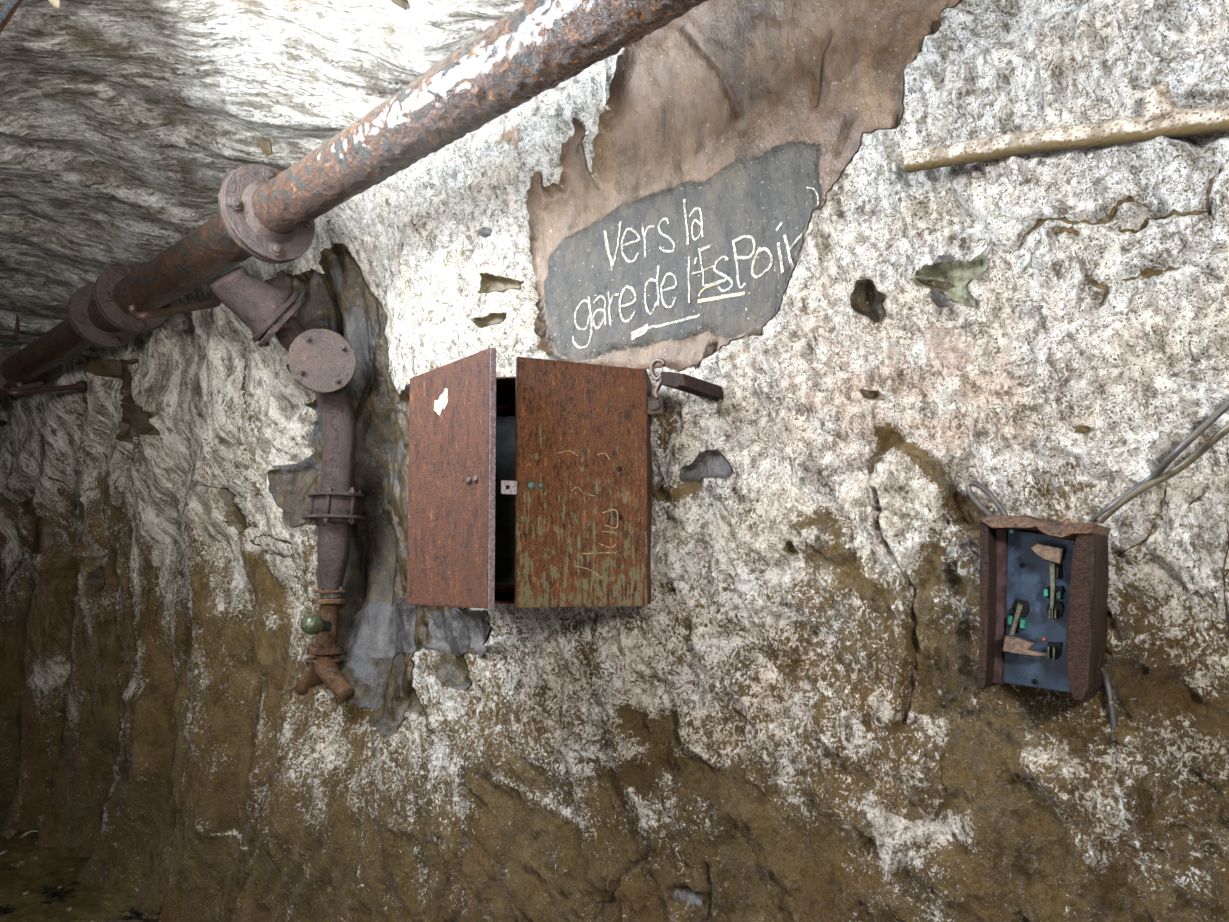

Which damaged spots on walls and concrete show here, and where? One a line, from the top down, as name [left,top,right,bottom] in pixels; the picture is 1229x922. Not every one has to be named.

peeling [264,243,492,736]
spalling [470,312,506,328]
peeling [477,0,963,370]